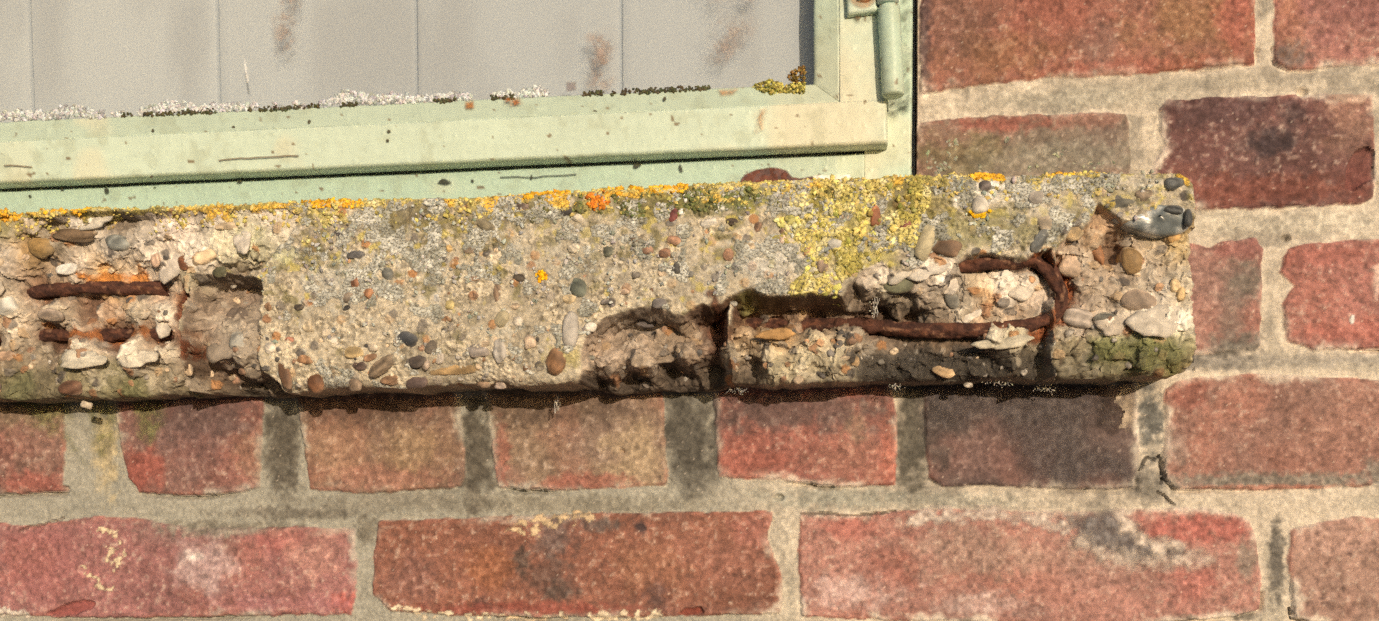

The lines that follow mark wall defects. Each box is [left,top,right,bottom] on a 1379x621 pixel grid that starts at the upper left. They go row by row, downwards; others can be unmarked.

corrosion [69,325,151,345]
corrosion [77,272,150,283]
spalling [0,206,303,401]
spalling [576,203,1197,428]
corrosion [1029,252,1073,343]
damp [857,344,1127,487]